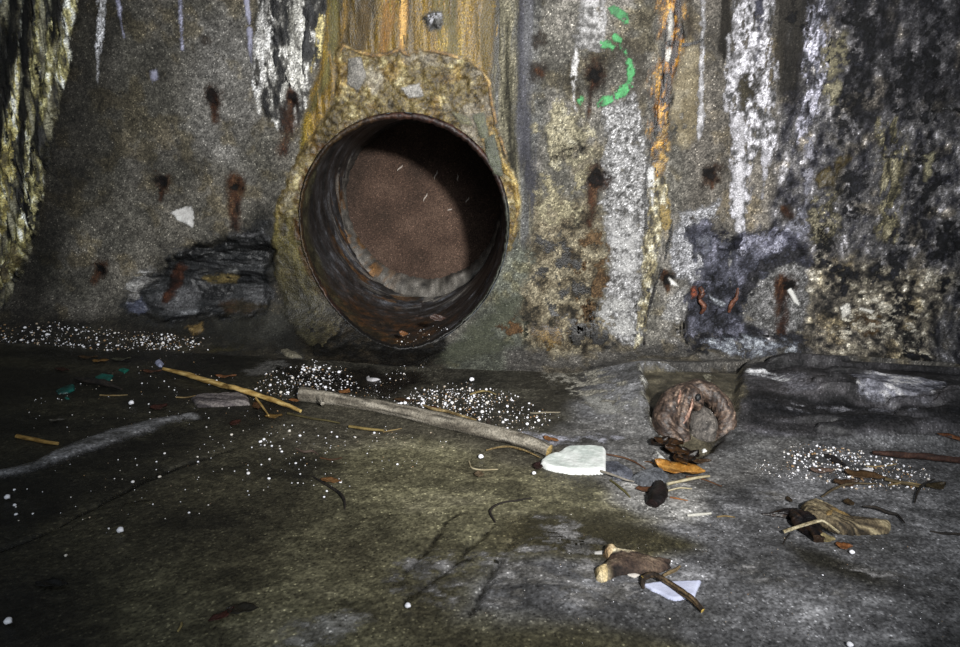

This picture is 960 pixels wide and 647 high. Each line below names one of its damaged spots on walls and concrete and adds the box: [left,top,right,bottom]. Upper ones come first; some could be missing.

corrosion [205,85,221,123]
spalling [120,42,521,347]
corrosion [280,0,506,155]
corrosion [299,112,510,350]
water stain [491,0,646,359]
corrosion [587,163,612,227]
corrosion [659,270,676,292]
corrosion [648,0,706,180]
water stain [685,0,706,139]
spalling [662,202,815,360]
corrosion [774,275,799,335]
water stain [718,0,960,362]